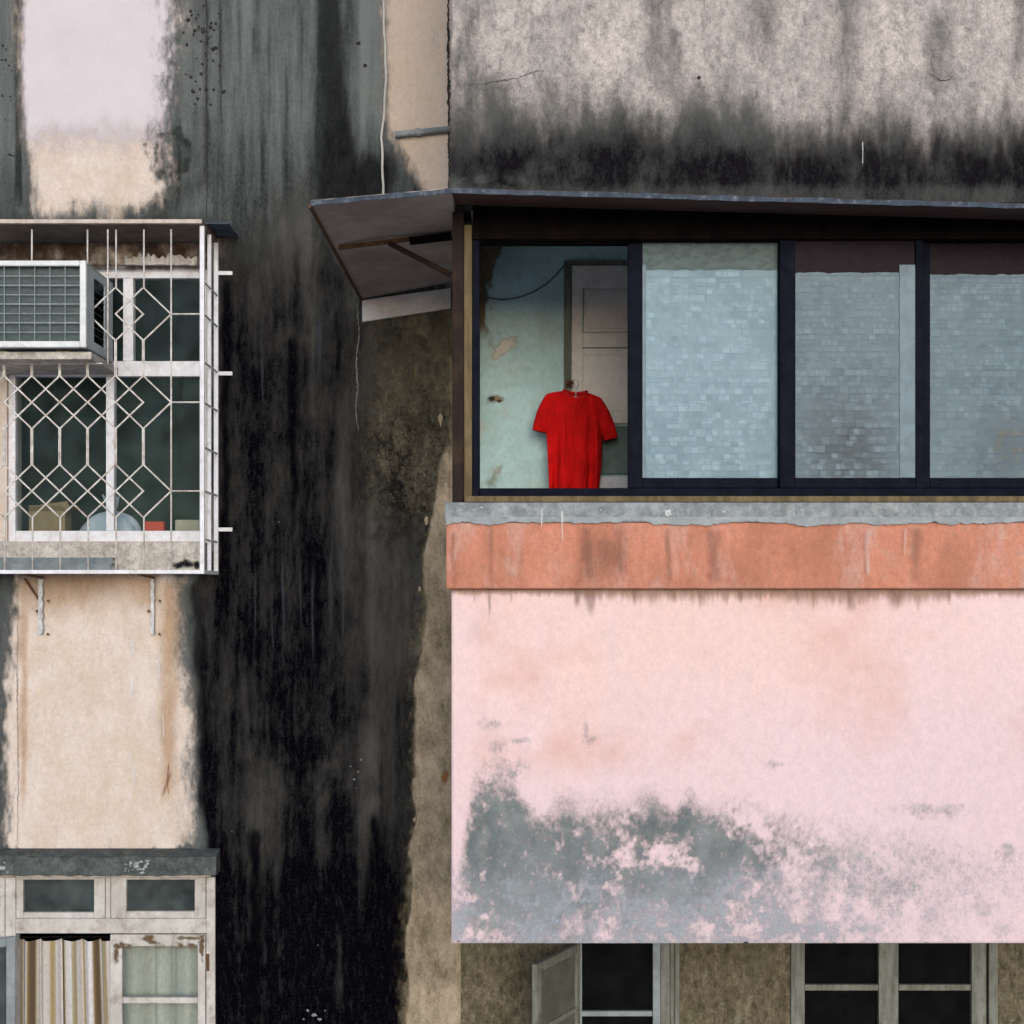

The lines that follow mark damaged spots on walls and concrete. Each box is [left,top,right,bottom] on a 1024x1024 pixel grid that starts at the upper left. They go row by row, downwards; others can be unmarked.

water stain [450,77,1024,211]
water stain [0,0,451,1024]
water stain [452,589,1024,603]
water stain [452,782,877,943]
peeling [113,942,131,961]
peeling [178,935,205,961]